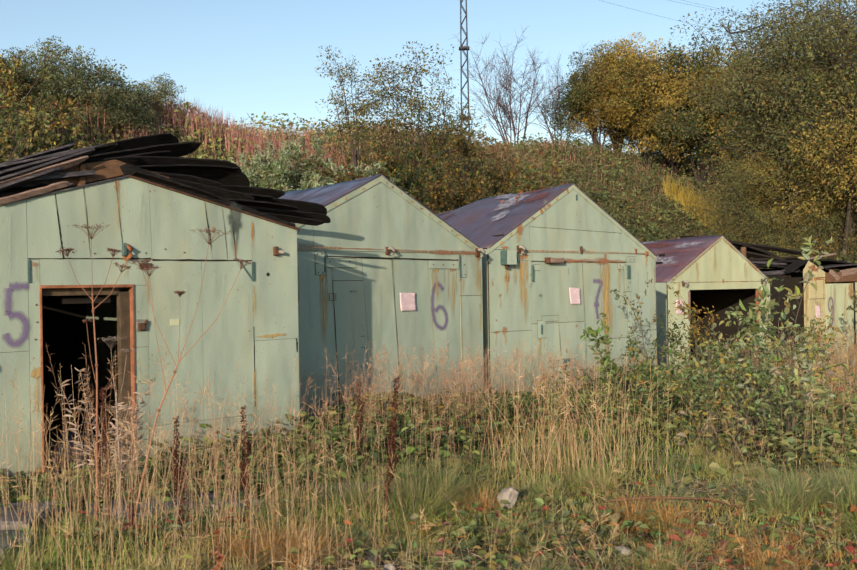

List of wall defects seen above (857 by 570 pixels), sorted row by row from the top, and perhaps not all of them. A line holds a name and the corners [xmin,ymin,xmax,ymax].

leakage [229,205,241,239]
corrosion [499,225,586,311]
corrosion [598,252,623,334]